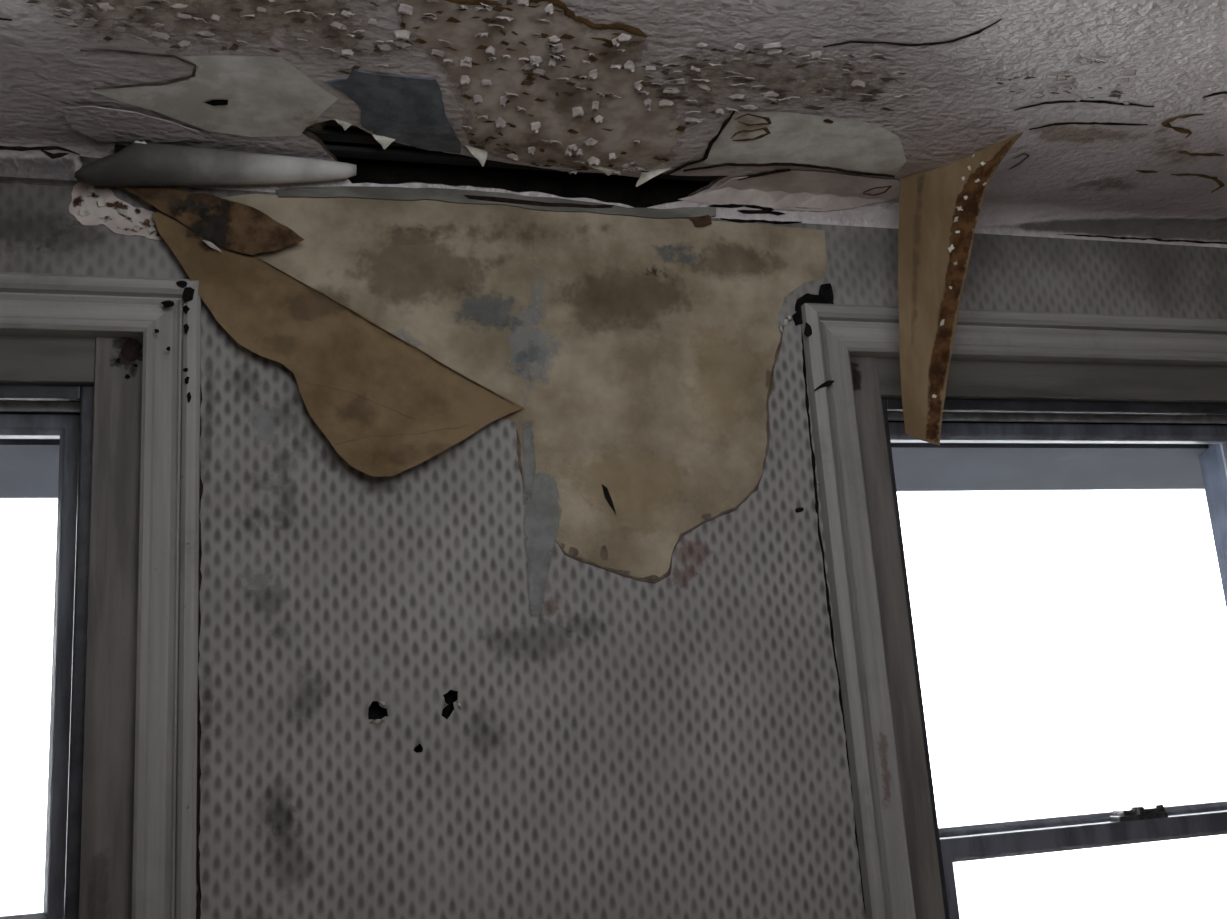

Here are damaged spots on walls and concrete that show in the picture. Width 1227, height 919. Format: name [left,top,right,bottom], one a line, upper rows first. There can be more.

peeling [26,0,487,166]
water stain [394,0,687,176]
peeling [69,42,914,584]